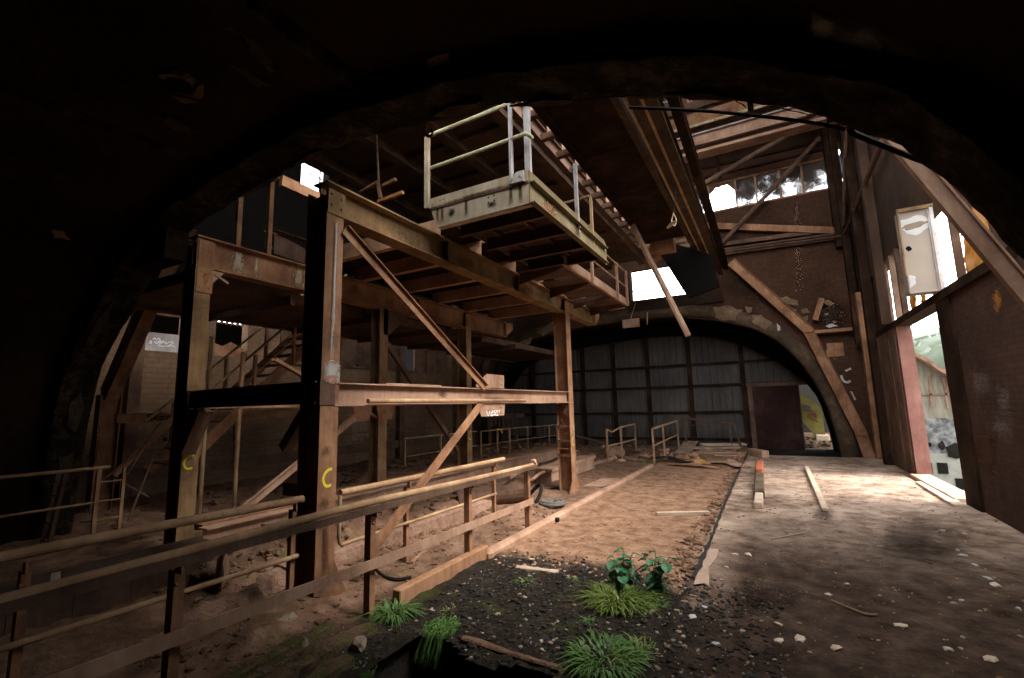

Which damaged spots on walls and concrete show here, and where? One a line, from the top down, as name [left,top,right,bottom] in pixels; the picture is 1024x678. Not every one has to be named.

peeling [713,305,780,331]